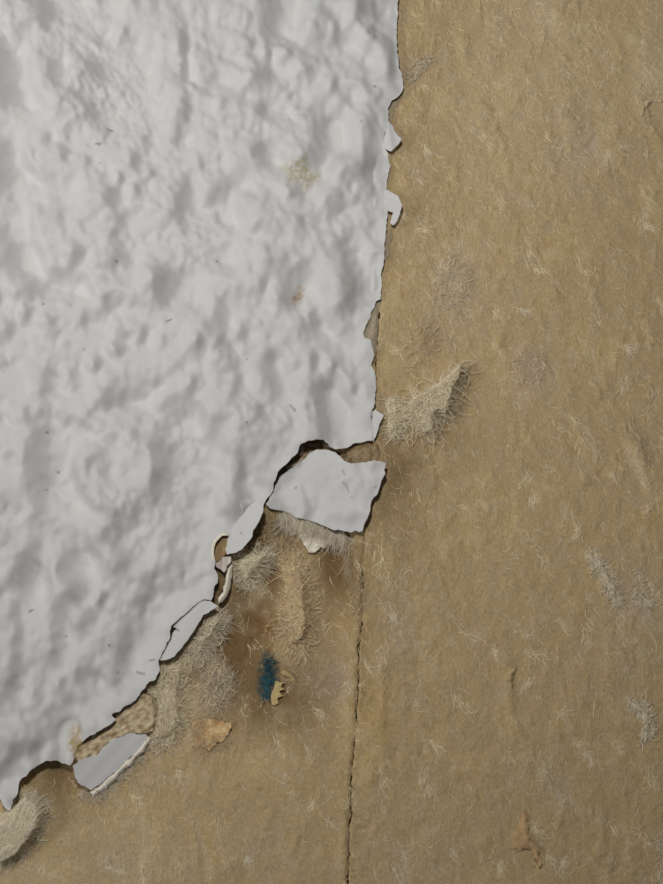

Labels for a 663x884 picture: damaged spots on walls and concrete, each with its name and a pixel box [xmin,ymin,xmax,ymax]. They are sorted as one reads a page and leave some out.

peeling [383,121,402,152]
peeling [385,190,402,225]
peeling [372,410,384,442]
peeling [225,442,386,586]
peeling [160,600,218,661]
peeling [271,671,295,705]
peeling [71,692,167,811]
peeling [182,692,241,760]
crack [343,571,367,884]